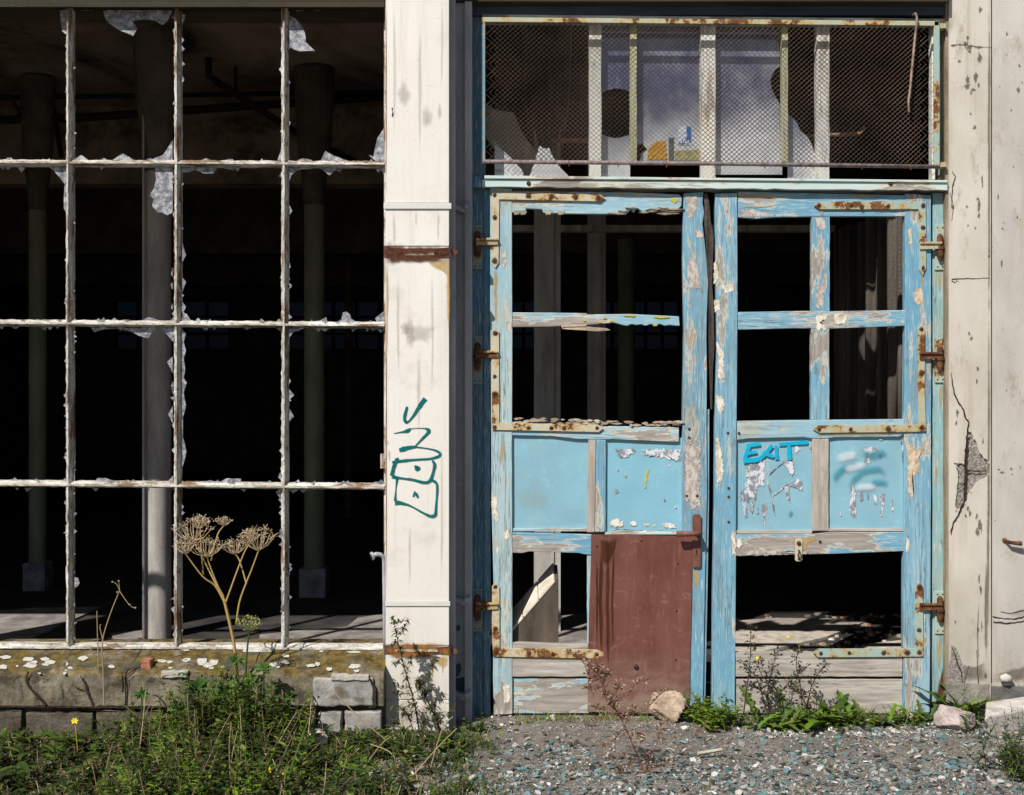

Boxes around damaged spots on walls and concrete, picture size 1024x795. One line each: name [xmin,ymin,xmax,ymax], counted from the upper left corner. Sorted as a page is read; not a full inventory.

peeling [671,193,703,238]
corrosion [385,246,449,323]
peeling [687,257,700,290]
peeling [616,434,702,514]
peeling [737,446,811,526]
peeling [840,485,894,517]
peeling [901,439,924,502]
crack [950,374,986,535]
spalling [954,432,1004,511]
corrosion [596,541,616,656]
corrosion [387,644,449,675]